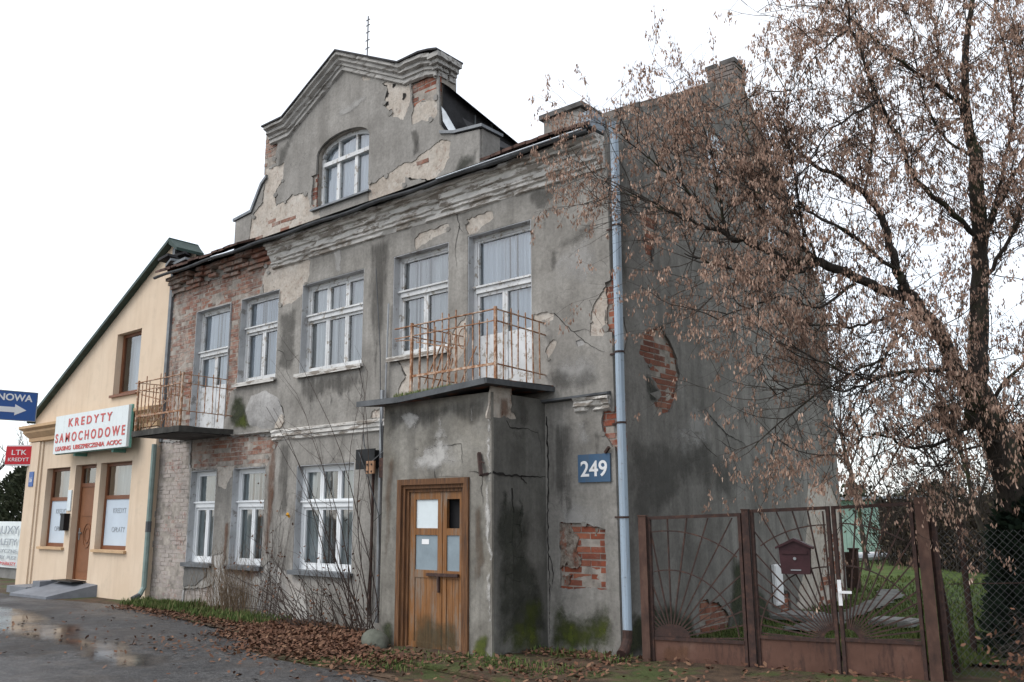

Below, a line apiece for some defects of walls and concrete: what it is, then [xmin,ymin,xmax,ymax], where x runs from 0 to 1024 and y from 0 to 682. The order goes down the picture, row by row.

peeling [381,75,442,124]
peeling [245,135,320,251]
peeling [368,139,450,203]
peeling [415,224,450,250]
peeling [463,211,493,234]
spalling [576,274,627,349]
flaking render [639,322,678,414]
flaking render [150,258,312,619]
crack [417,416,554,633]
damp [498,493,543,636]
flaking render [560,522,606,590]